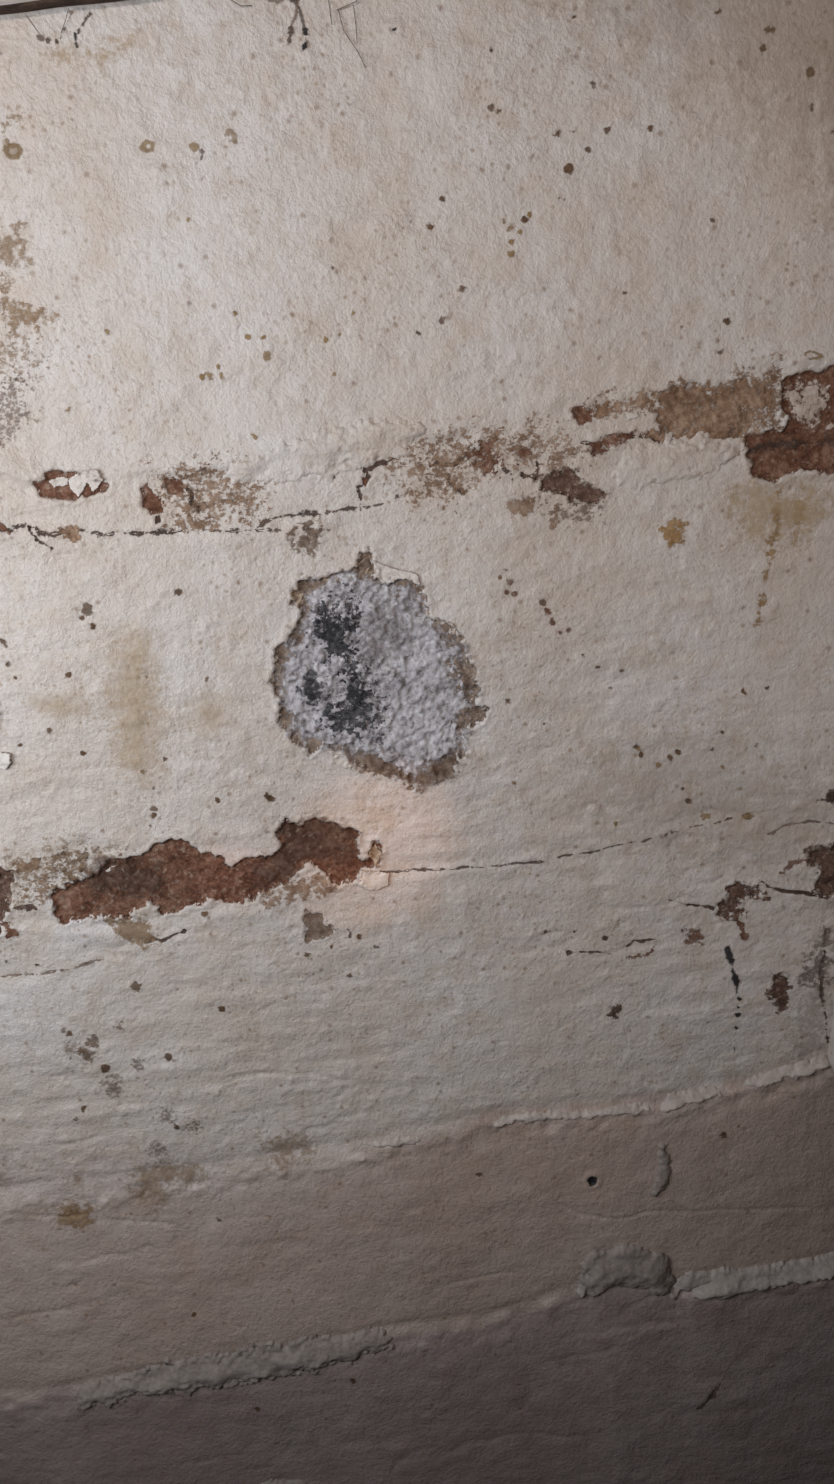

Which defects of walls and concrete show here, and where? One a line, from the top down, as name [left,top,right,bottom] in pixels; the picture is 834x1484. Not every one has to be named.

flaking render [356,352,834,530]
peeling [33,469,109,501]
peeling [136,438,276,541]
crack [0,494,400,559]
crack [380,817,732,873]
crack [767,820,834,835]
flaking render [0,817,389,951]